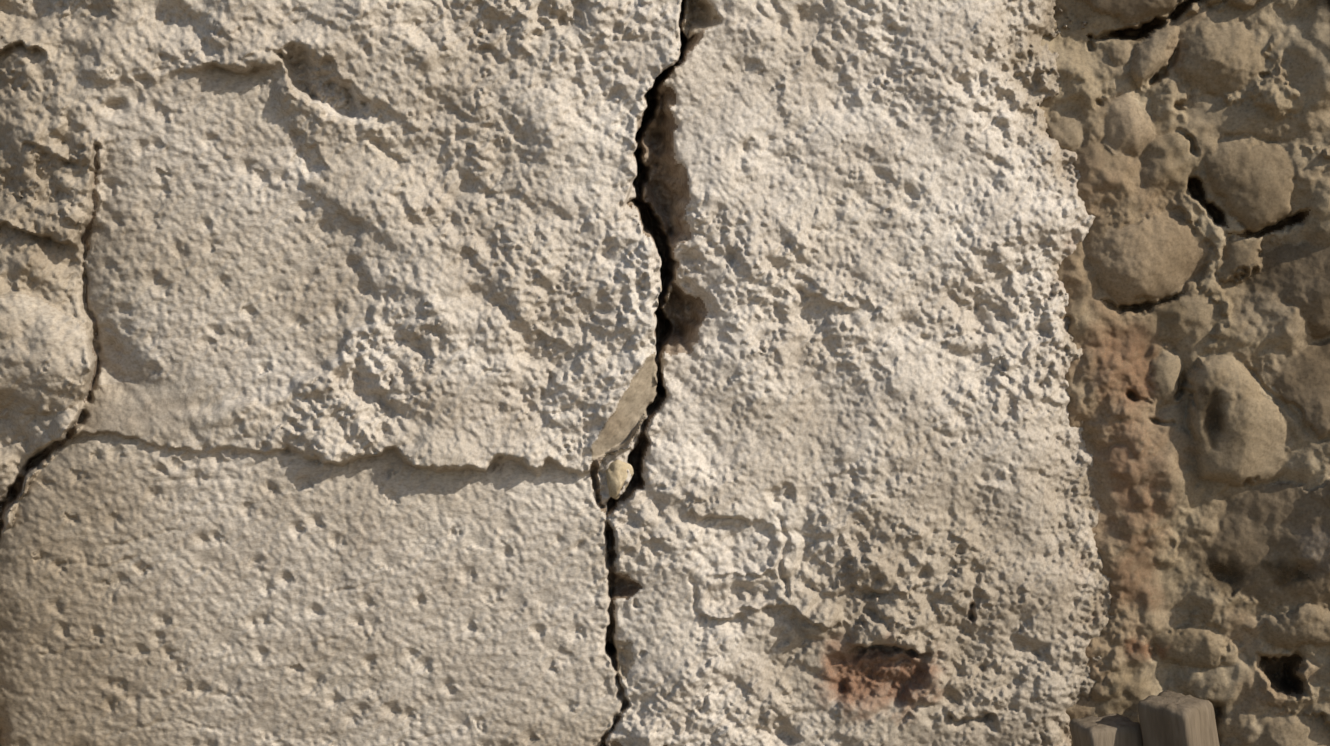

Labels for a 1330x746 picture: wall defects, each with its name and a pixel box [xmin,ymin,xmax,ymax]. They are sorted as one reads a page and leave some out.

crack [0,146,100,541]
crack [590,0,722,746]